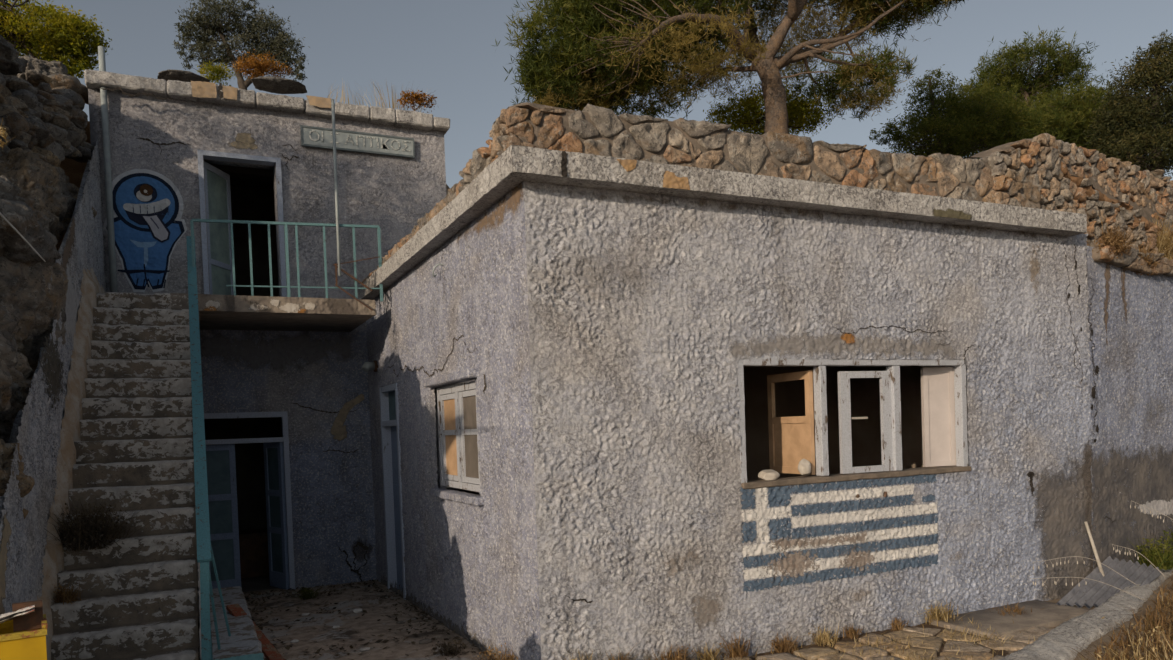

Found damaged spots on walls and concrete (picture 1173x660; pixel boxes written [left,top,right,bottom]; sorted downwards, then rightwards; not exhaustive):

crack [833,325,974,366]
crack [1064,241,1098,448]
damp [1104,263,1127,345]
peeling [51,292,196,660]
peeling [762,529,877,583]
damp [1082,440,1093,572]